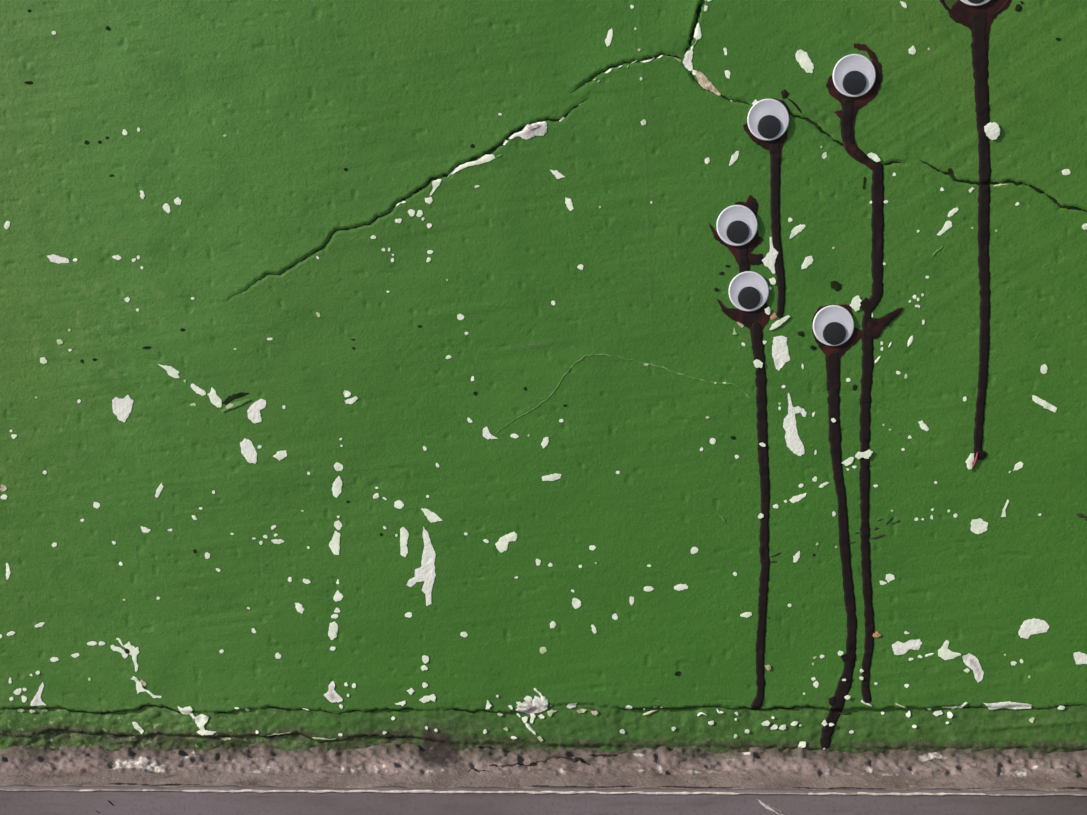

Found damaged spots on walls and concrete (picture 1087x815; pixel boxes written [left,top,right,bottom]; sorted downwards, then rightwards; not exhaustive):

crack [227,0,752,300]
crack [790,112,843,146]
crack [884,159,1087,212]
peeling [112,395,133,422]
peeling [158,364,266,423]
peeling [783,393,807,456]
peeling [407,508,443,606]
peeling [1018,618,1050,639]
peeling [892,631,984,682]
crack [2,705,181,738]
crack [205,706,421,743]
crack [617,704,816,712]